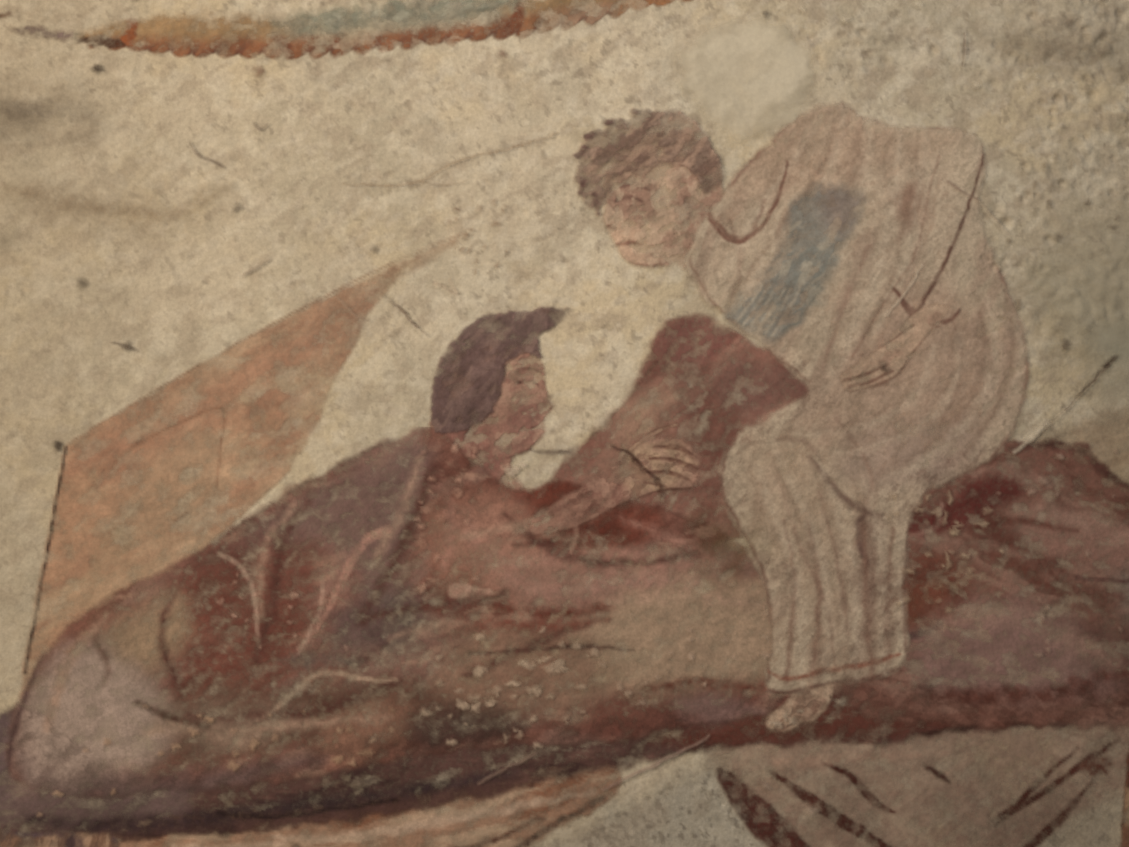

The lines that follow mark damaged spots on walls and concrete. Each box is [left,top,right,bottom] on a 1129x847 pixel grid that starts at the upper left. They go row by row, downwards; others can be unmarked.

crack [1014,357,1115,453]
crack [616,448,662,496]